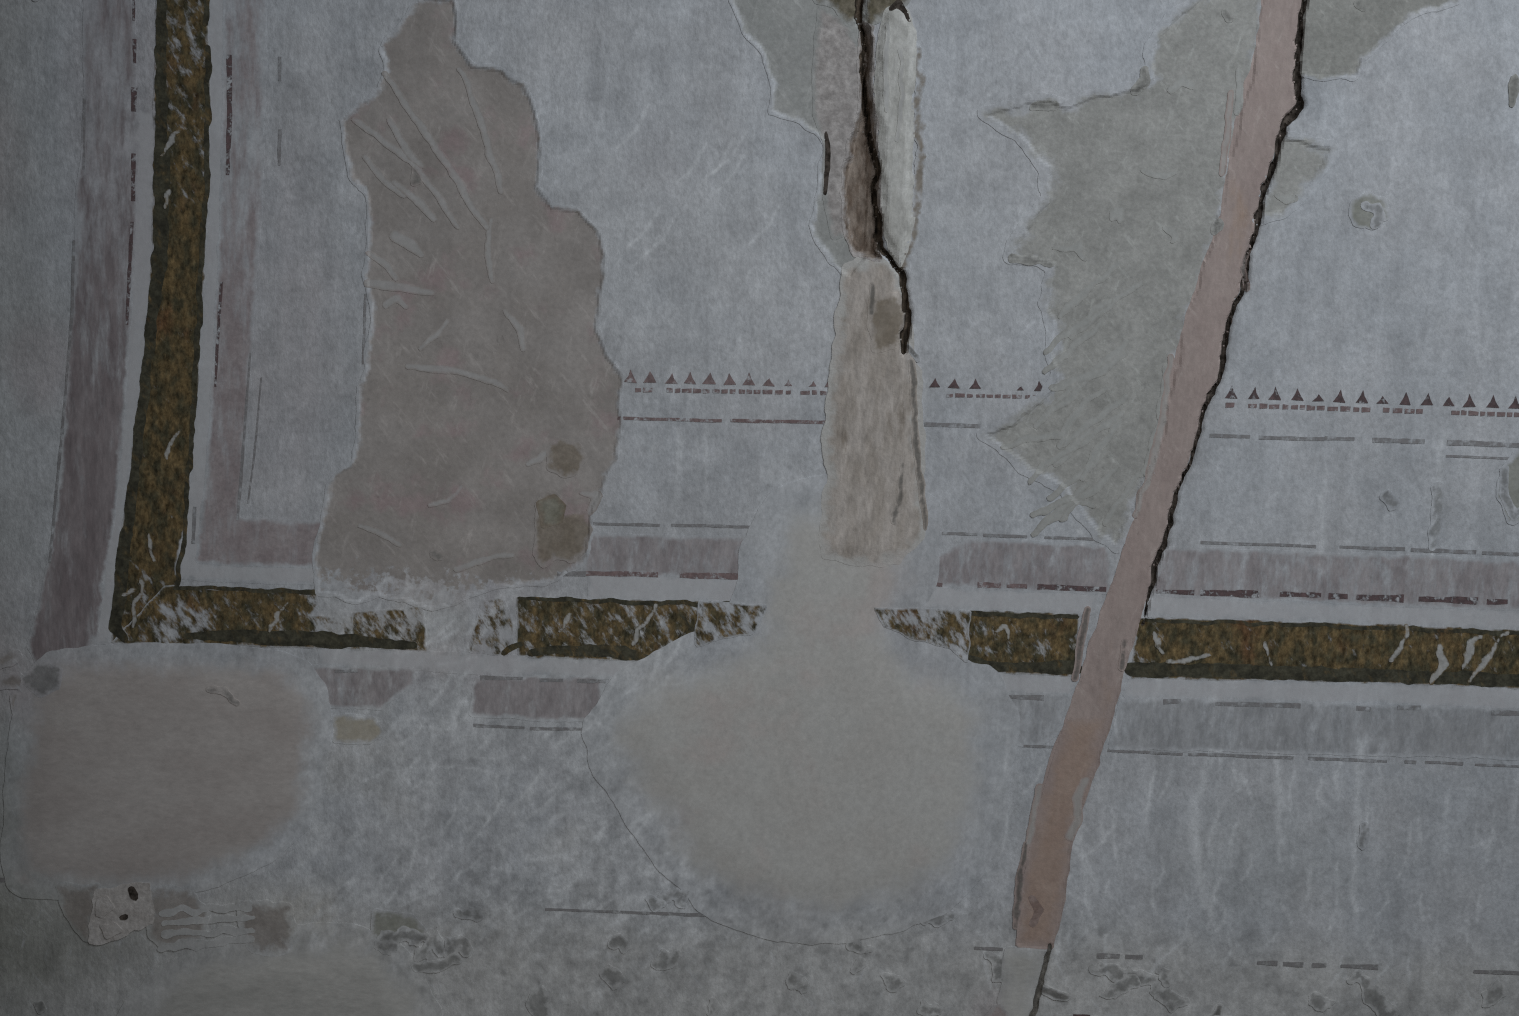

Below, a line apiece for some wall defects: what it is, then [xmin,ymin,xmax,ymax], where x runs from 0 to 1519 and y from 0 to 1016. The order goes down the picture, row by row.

peeling [312,0,624,611]
peeling [729,0,917,275]
crack [840,0,928,531]
peeling [977,0,1262,553]
crack [1141,0,1307,626]
peeling [1508,74,1519,107]
crack [1029,944,1070,1016]